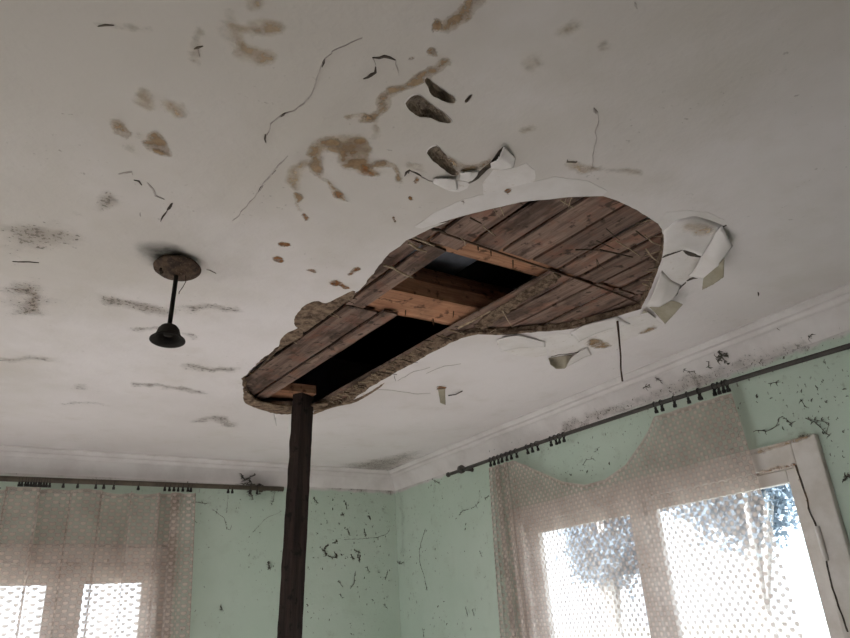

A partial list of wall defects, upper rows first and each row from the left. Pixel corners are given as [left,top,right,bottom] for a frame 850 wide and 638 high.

water stain [432,0,473,30]
crack [264,38,362,144]
water stain [361,49,448,122]
flaking render [404,77,472,124]
crack [567,108,599,166]
crack [232,156,288,221]
water stain [289,138,401,202]
peeling [415,145,617,228]
peeling [323,205,733,408]
flaking render [241,347,292,405]